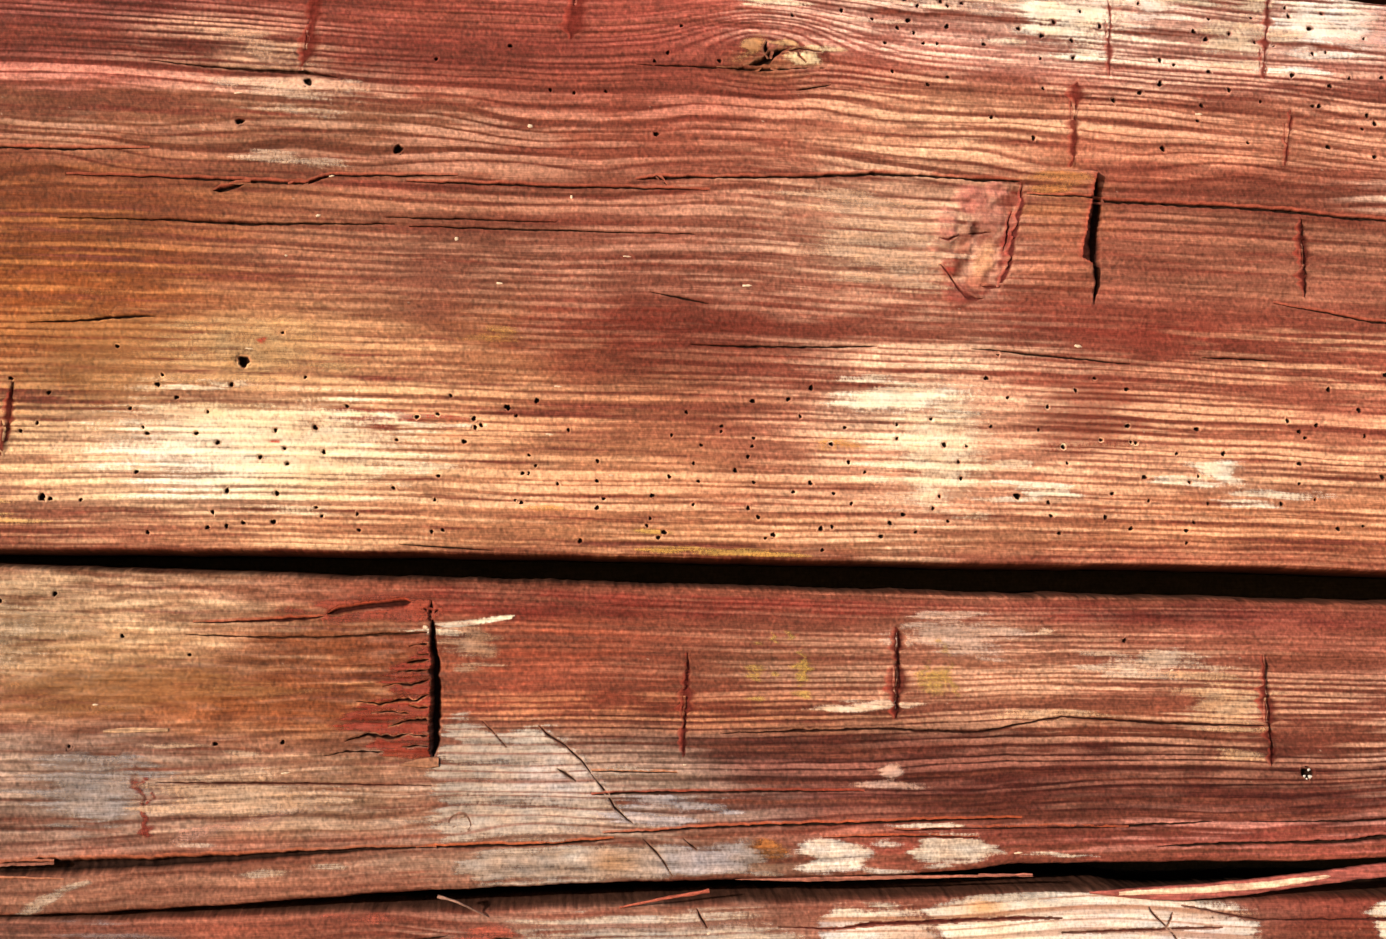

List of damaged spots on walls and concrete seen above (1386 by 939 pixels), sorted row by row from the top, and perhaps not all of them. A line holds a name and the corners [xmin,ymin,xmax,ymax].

peeling [815,700,923,712]
crack [720,713,1264,736]
peeling [0,744,353,835]
peeling [426,713,776,887]
crack [0,720,1386,881]
peeling [786,823,1000,874]
crack [406,931,448,939]
crack [494,931,553,939]
crack [694,909,710,929]
peeling [515,892,1259,939]
crack [778,904,1386,939]
peeling [1369,902,1386,939]